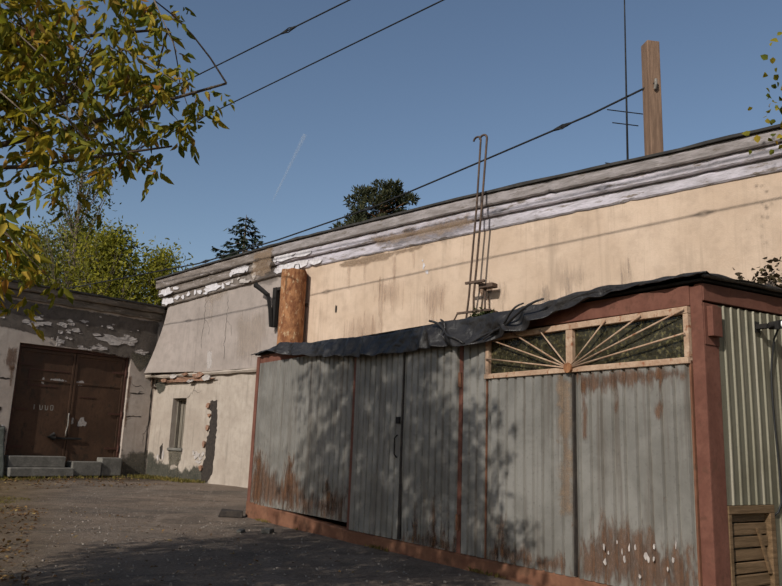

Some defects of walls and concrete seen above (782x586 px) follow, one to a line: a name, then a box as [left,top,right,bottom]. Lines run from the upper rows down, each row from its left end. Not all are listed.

peeling [158,263,261,305]
peeling [268,250,322,274]
peeling [22,315,149,355]
spalling [192,400,217,482]
rust [251,451,345,519]
rust [583,523,696,586]